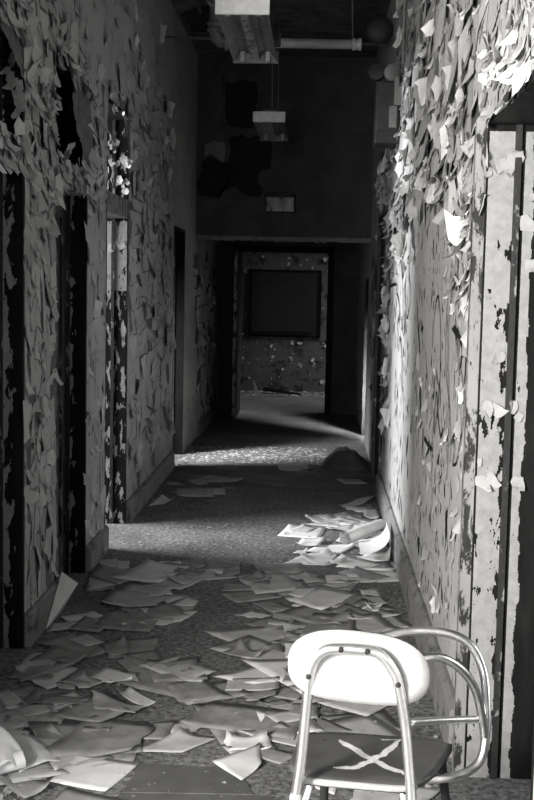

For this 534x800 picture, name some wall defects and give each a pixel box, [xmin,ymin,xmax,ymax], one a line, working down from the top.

peeling [0,0,178,648]